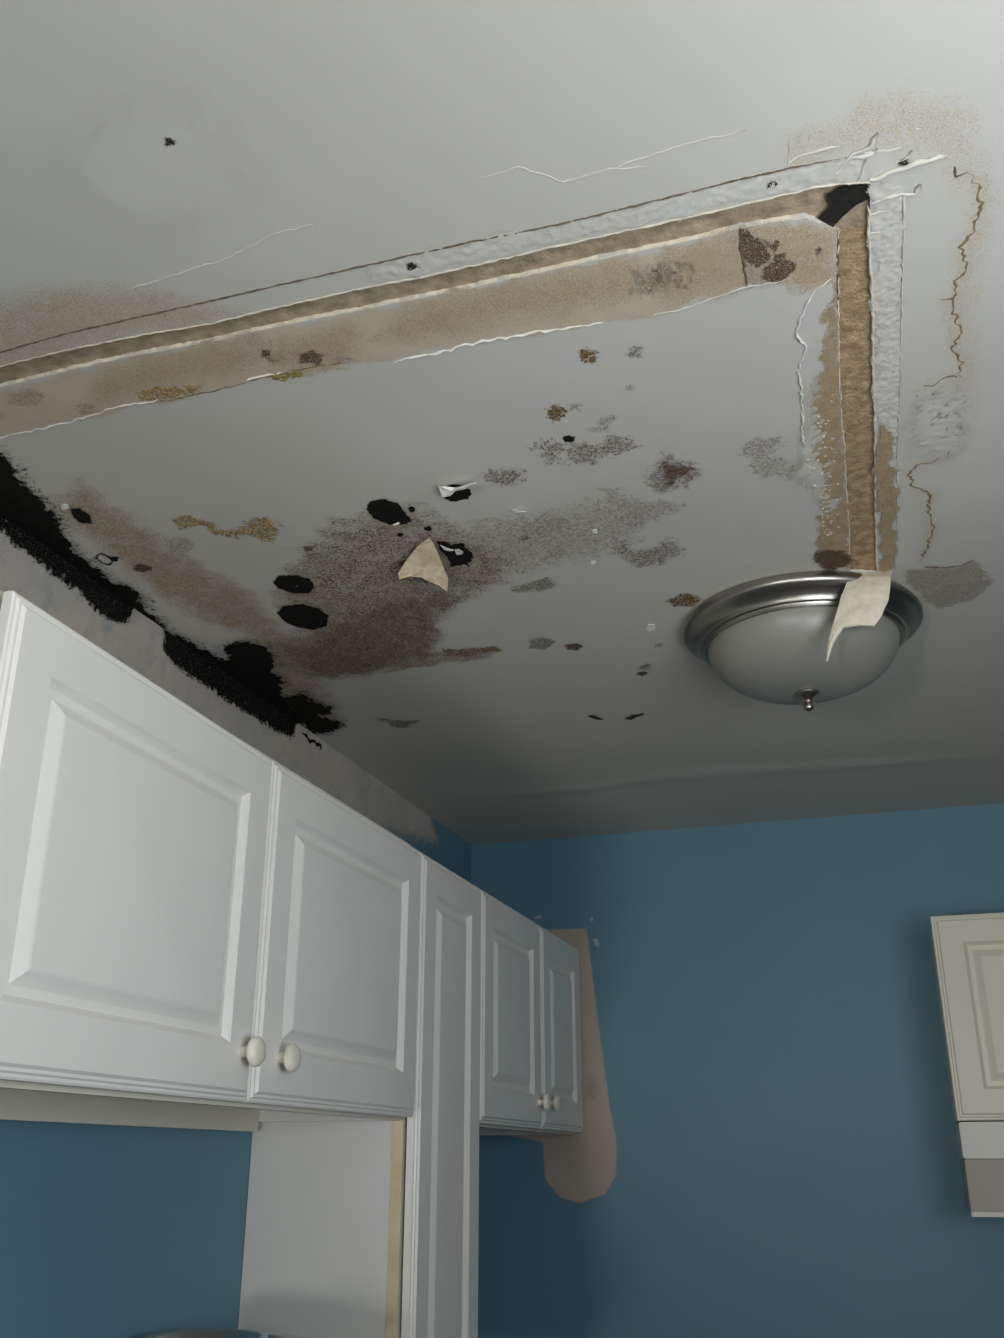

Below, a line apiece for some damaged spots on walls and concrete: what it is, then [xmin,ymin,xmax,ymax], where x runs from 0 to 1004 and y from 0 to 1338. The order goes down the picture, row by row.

crack [480,130,745,184]
crack [0,157,847,353]
leakage [0,279,255,377]
leakage [134,382,208,403]
leakage [271,371,304,382]
peeling [0,132,948,572]
leakage [524,403,644,466]
leakage [579,347,600,364]
leakage [0,445,705,750]
spalling [398,538,473,591]
peeling [0,519,440,849]
peeling [509,915,618,1204]